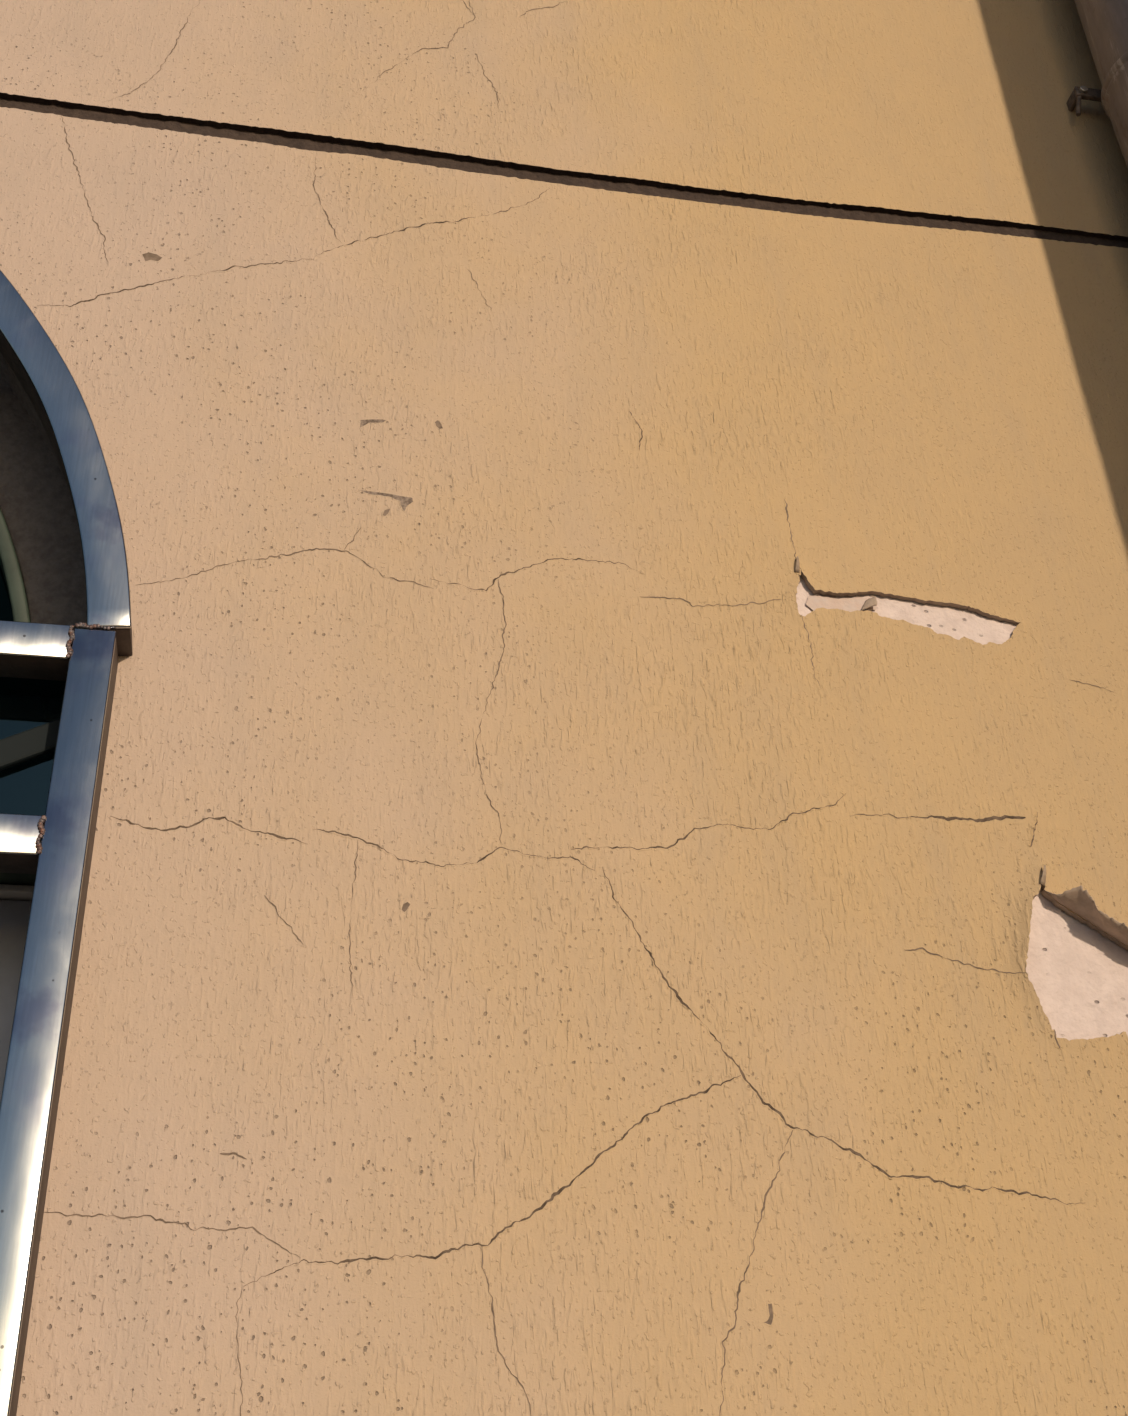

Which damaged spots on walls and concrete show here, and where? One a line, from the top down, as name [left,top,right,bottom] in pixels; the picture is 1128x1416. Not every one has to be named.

crack [37,116,550,309]
peeling [794,556,1017,645]
crack [47,499,1086,1416]
peeling [1026,858,1128,1050]